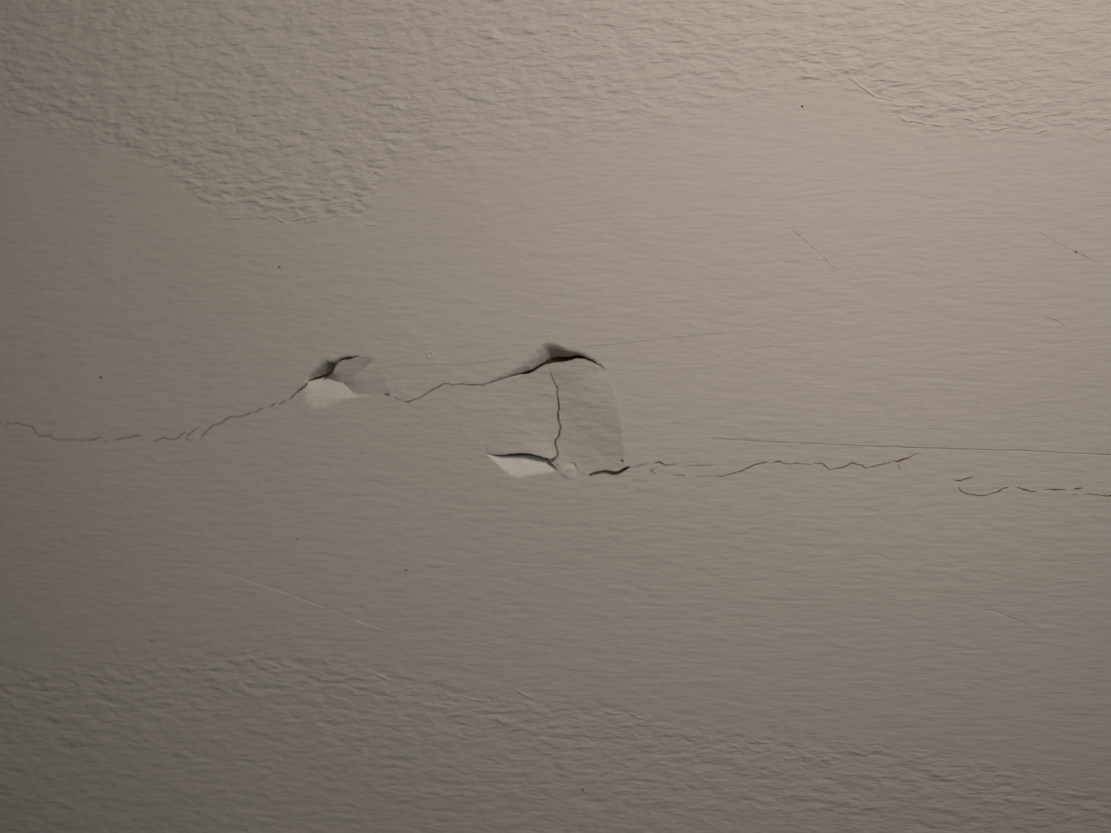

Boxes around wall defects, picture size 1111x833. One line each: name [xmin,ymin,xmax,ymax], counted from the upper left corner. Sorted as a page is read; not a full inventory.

crack [1,383,308,442]
spalling [303,356,390,410]
crack [385,355,598,459]
spalling [487,448,559,478]
crack [631,453,918,477]
crack [955,477,1111,497]